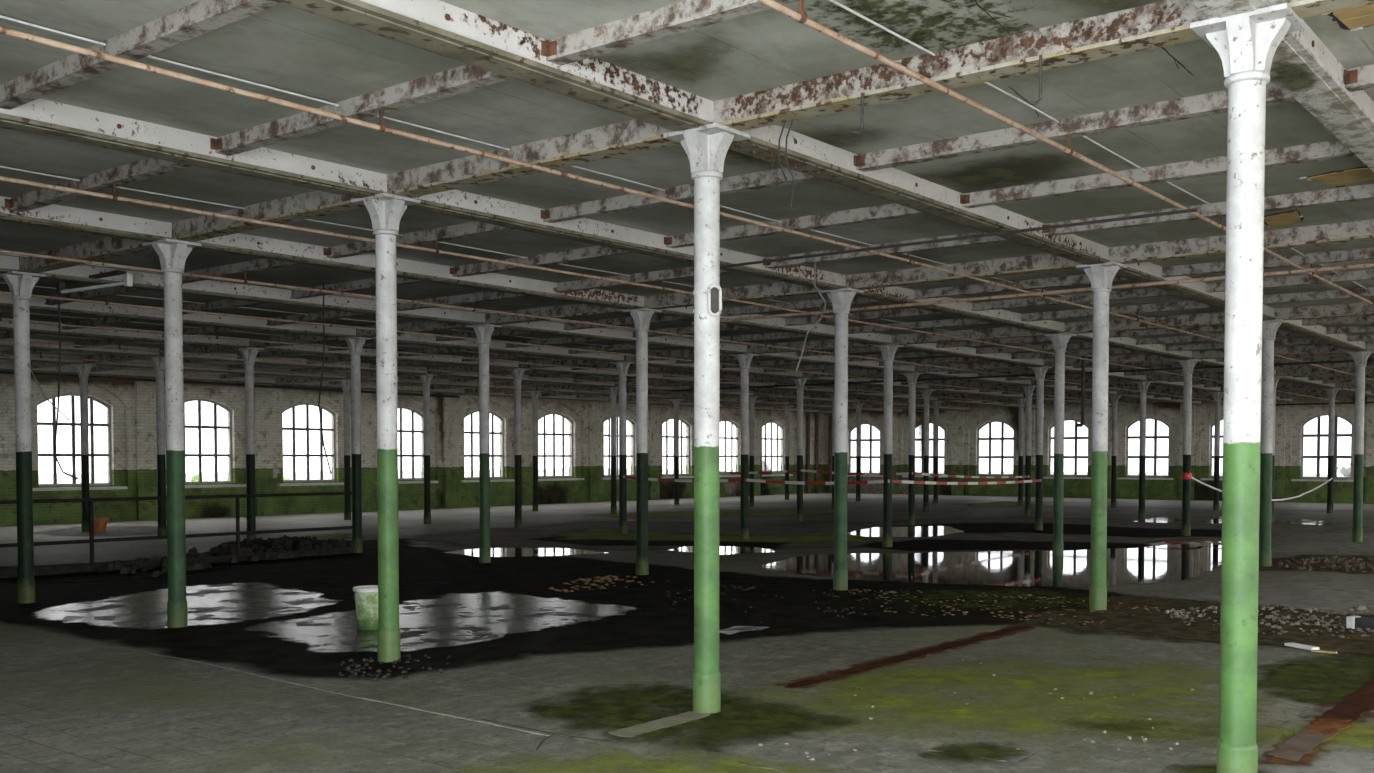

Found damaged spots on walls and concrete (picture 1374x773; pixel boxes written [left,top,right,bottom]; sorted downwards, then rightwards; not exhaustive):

corrosion [464,14,549,60]
damp [808,0,1029,50]
damp [1070,0,1141,13]
spalling [1322,4,1374,31]
corrosion [556,57,702,116]